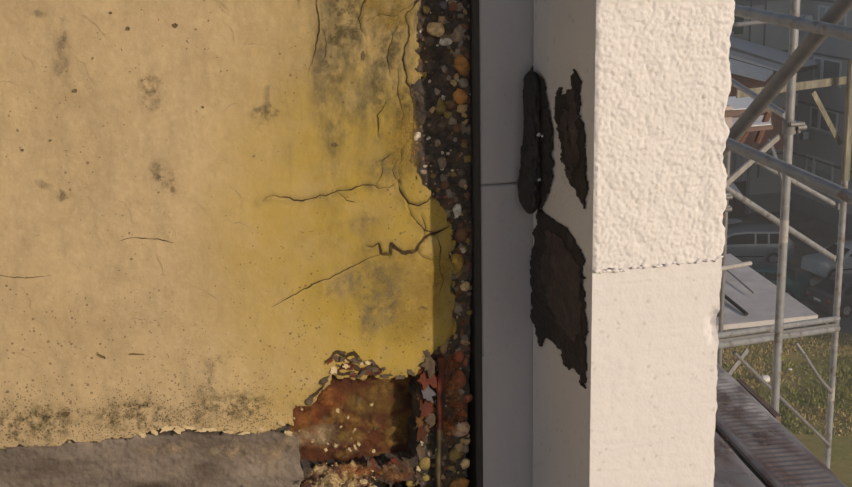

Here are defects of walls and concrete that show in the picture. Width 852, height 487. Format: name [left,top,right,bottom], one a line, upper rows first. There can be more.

crack [263,0,449,306]
spalling [277,0,473,487]
peeling [139,424,267,438]